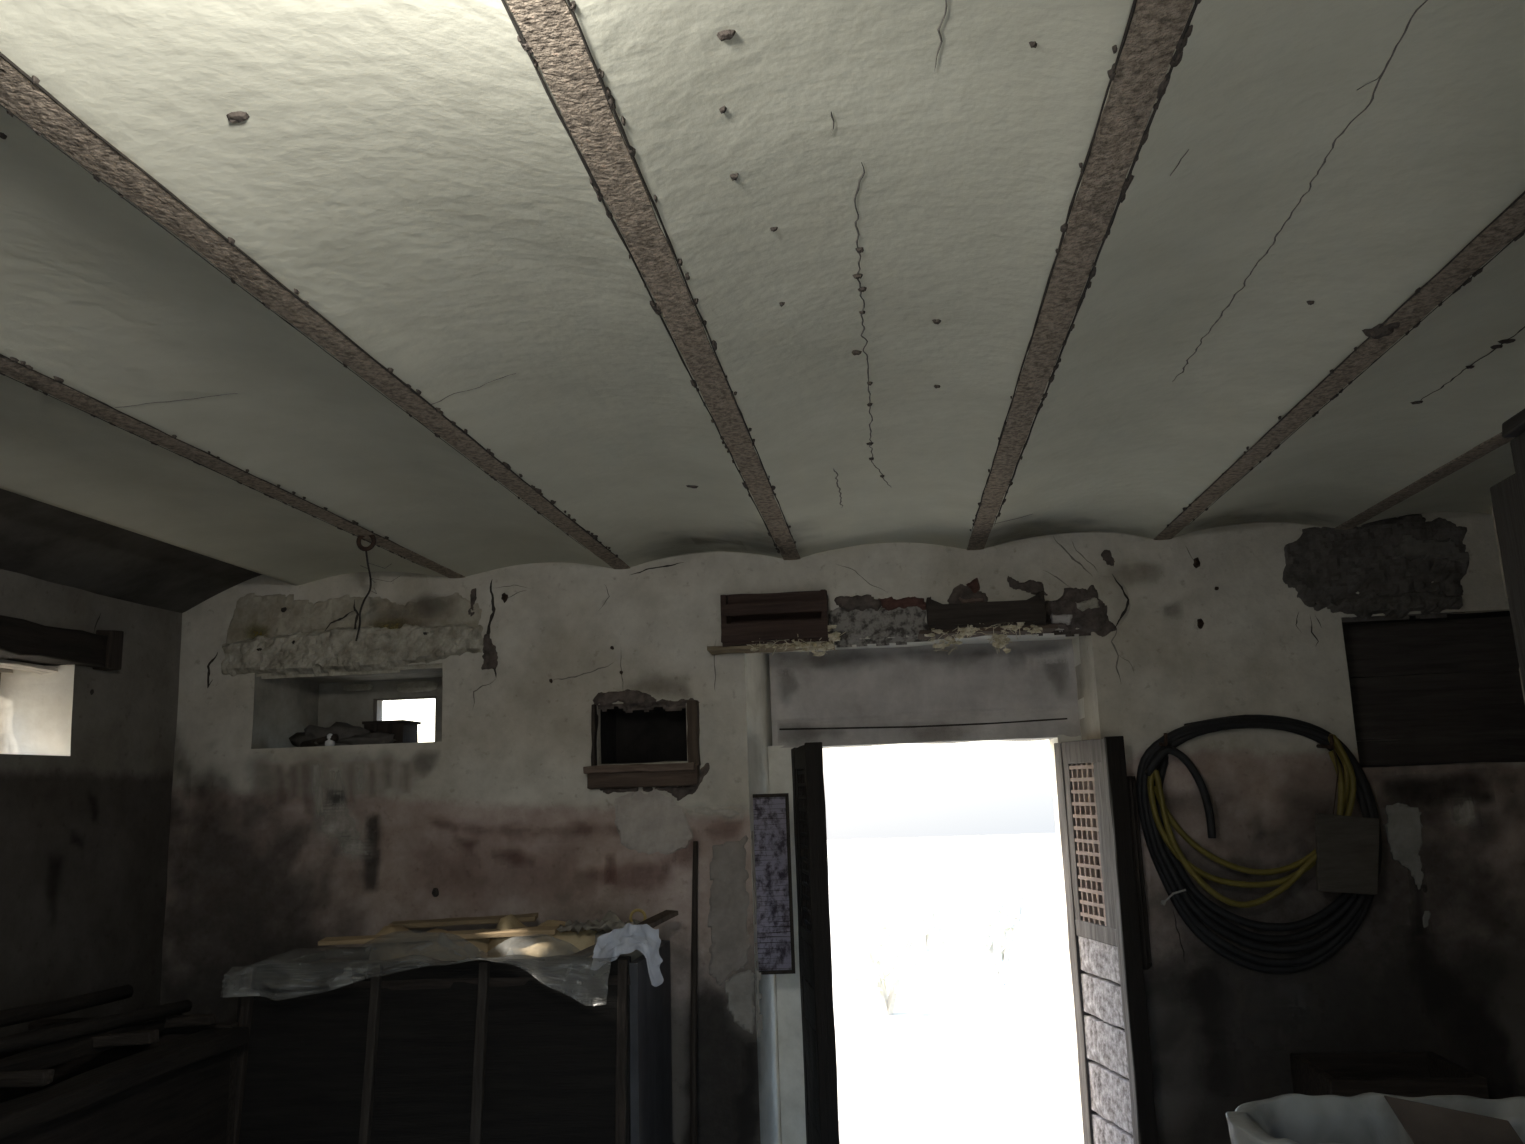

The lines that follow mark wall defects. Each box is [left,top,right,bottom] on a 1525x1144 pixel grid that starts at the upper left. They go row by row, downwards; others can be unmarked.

crack [1172,0,1428,382]
crack [833,162,890,507]
crack [1410,326,1525,404]
flaking render [226,588,498,670]
crack [473,580,526,707]
flaking render [834,594,926,612]
spalling [947,578,988,604]
spalling [1007,576,1048,596]
spalling [1282,514,1470,622]
leakage [313,766,379,888]
flaking render [1383,803,1427,892]
leakage [161,784,321,1020]